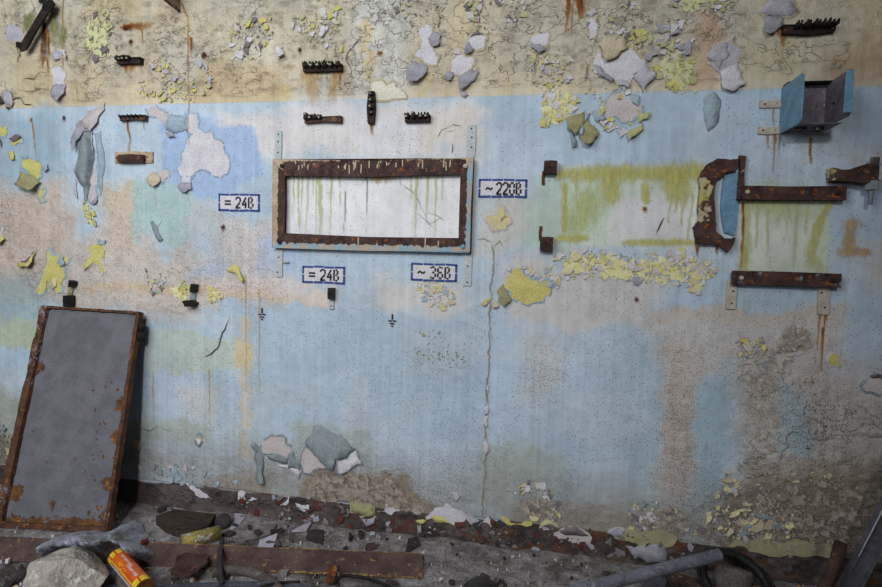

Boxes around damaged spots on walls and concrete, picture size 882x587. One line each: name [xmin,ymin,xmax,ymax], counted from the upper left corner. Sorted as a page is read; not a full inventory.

peeling [220,16,285,62]
peeling [291,0,345,52]
peeling [369,0,528,103]
peeling [529,0,735,153]
peeling [706,34,747,91]
peeling [0,124,48,204]
peeling [74,166,107,277]
peeling [138,58,231,192]
water stain [555,162,704,246]
peeling [18,248,70,297]
peeling [481,246,721,309]
crack [477,238,503,519]